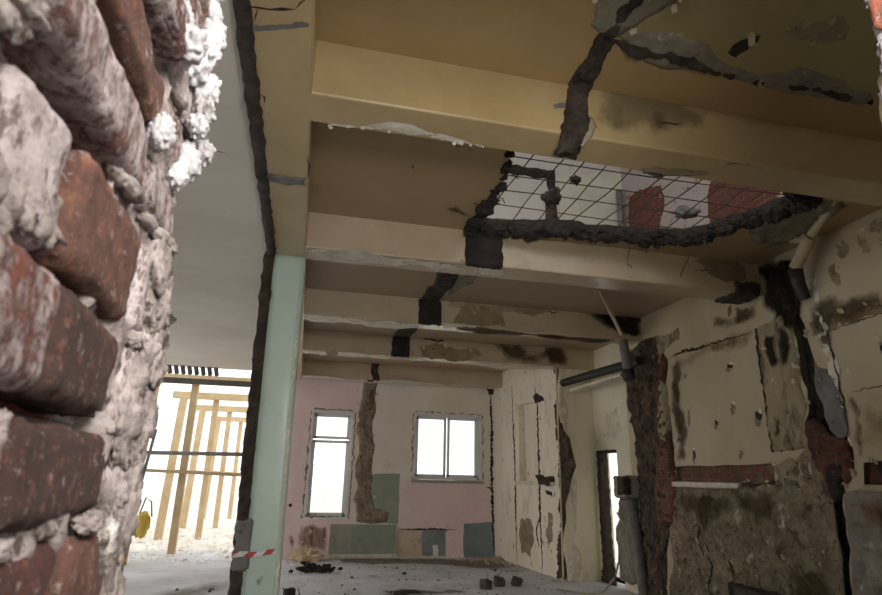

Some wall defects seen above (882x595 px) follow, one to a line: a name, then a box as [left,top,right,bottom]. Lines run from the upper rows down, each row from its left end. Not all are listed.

crack [251,0,305,21]
peeling [328,122,484,151]
spalling [463,150,849,283]
peeling [828,215,882,287]
peeling [303,350,391,359]
peeling [410,343,542,370]
flaking render [803,277,882,489]
leakage [812,297,880,345]
spalling [300,408,358,521]
spalling [411,411,484,480]
spalling [535,369,582,582]
peeling [519,518,534,558]